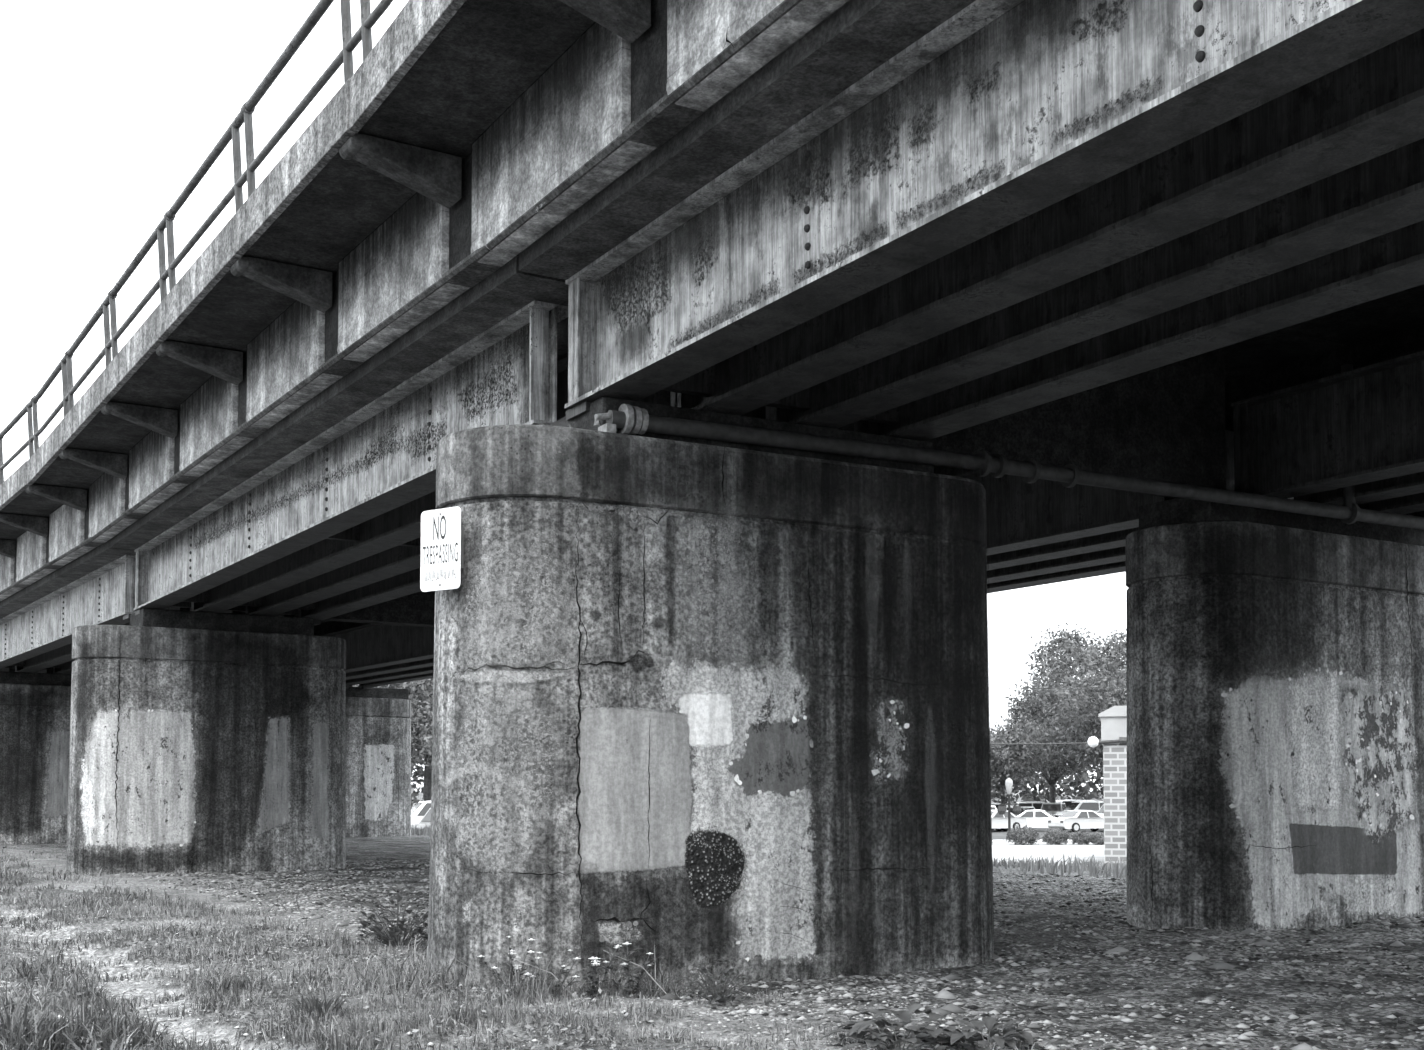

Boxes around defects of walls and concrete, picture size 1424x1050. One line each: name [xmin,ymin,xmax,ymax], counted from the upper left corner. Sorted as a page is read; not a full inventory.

water stain [601,0,1084,304]
crack [455,503,668,948]
water stain [769,457,994,966]
water stain [1199,702,1244,923]
water stain [1194,527,1323,678]
peeling [1289,667,1420,845]